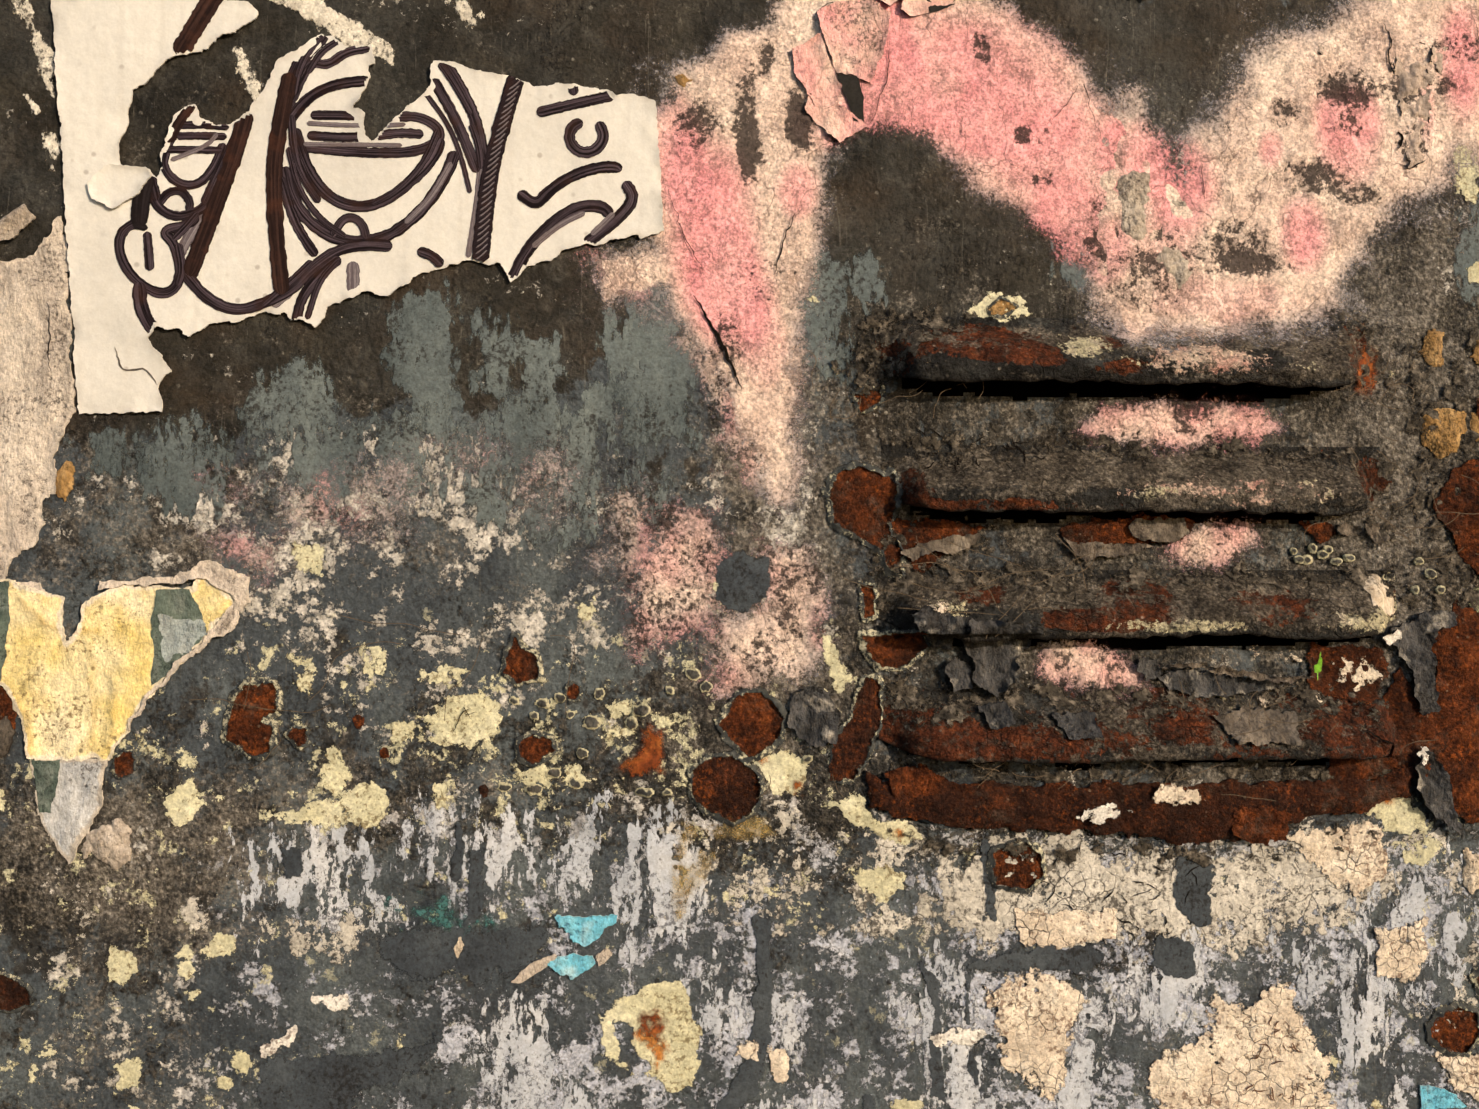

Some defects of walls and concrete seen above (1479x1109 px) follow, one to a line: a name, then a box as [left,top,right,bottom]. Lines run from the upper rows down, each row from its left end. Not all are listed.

peeling [792,0,955,143]
corrosion [851,381,885,414]
corrosion [1356,347,1377,394]
corrosion [0,686,17,729]
corrosion [220,676,312,762]
corrosion [620,727,664,777]
corrosion [687,686,789,827]
corrosion [821,459,1479,894]
peeling [149,746,1479,1109]
corrosion [636,1010,666,1067]
corrosion [1425,965,1479,1058]